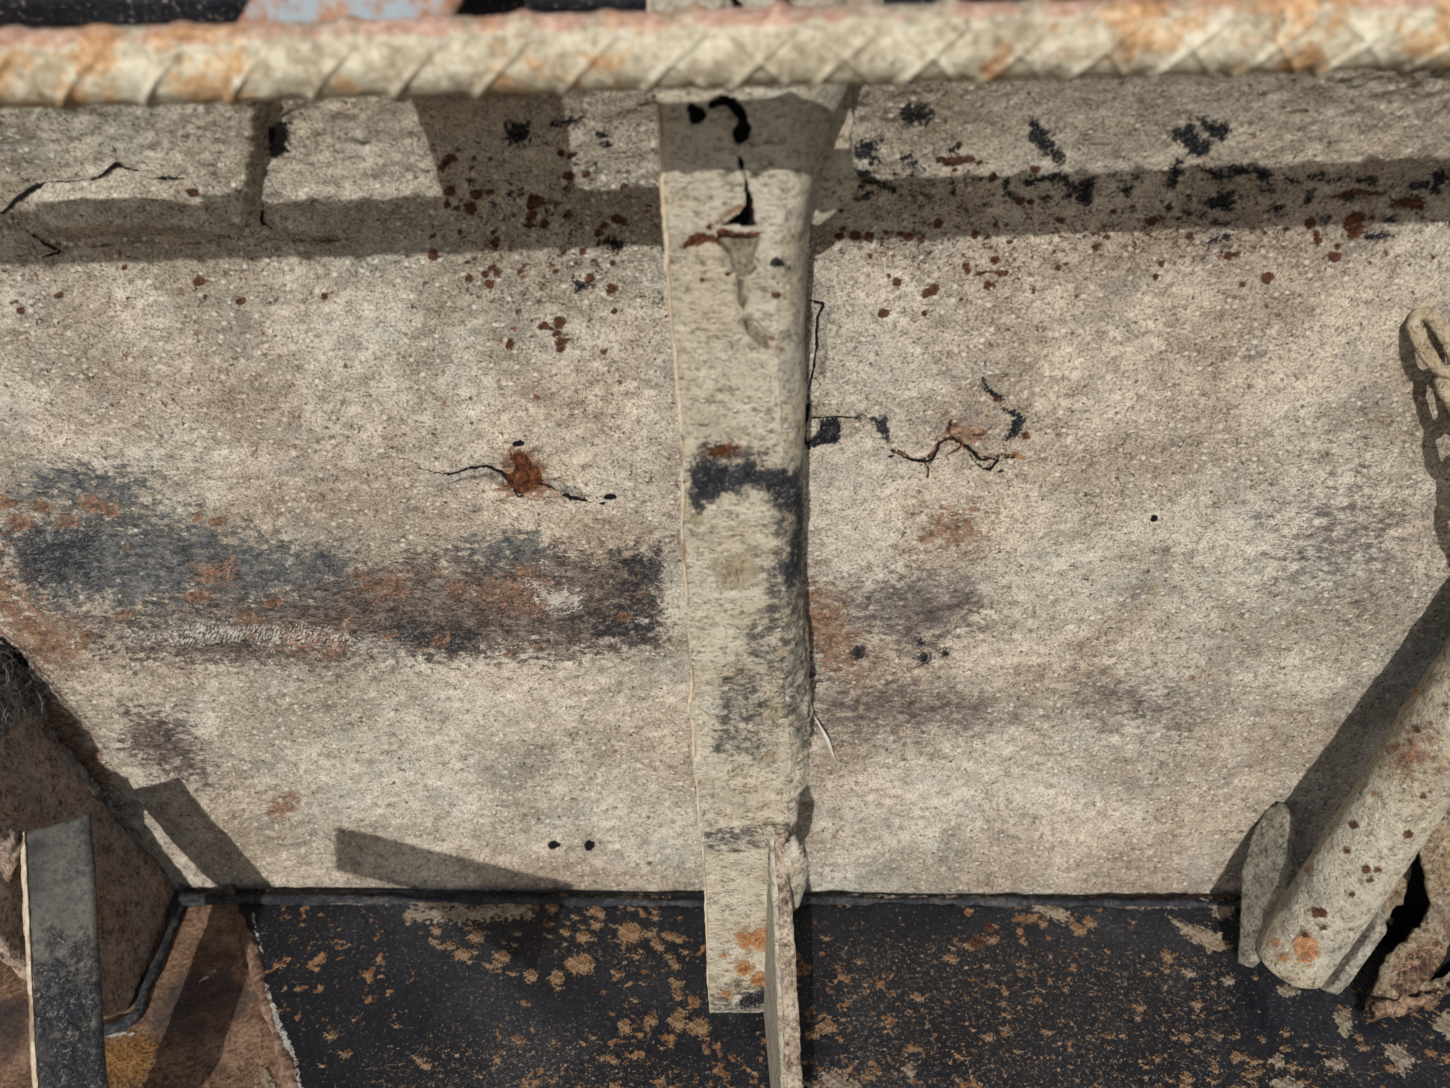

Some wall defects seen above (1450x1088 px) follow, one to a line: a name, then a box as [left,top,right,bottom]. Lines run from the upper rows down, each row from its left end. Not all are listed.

corrosion [192,266,218,299]
corrosion [428,142,628,354]
spalling [719,237,769,349]
corrosion [834,141,1445,317]
water stain [0,452,385,644]
crack [418,440,617,507]
crack [804,300,1025,478]
corrosion [0,488,681,817]
crack [809,658,835,685]
corrosion [261,784,306,823]